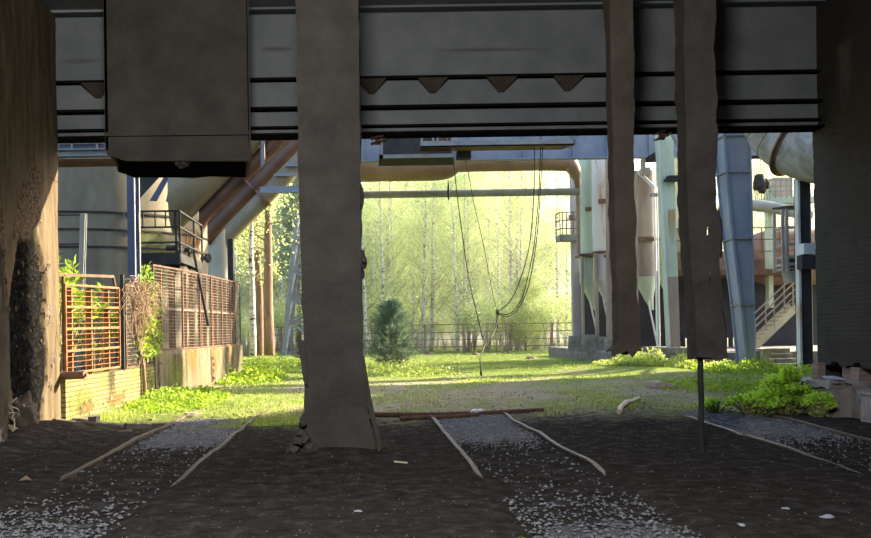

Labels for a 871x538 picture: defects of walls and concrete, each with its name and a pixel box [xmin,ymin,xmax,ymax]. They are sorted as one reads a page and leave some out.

spalling [9,163,56,421]